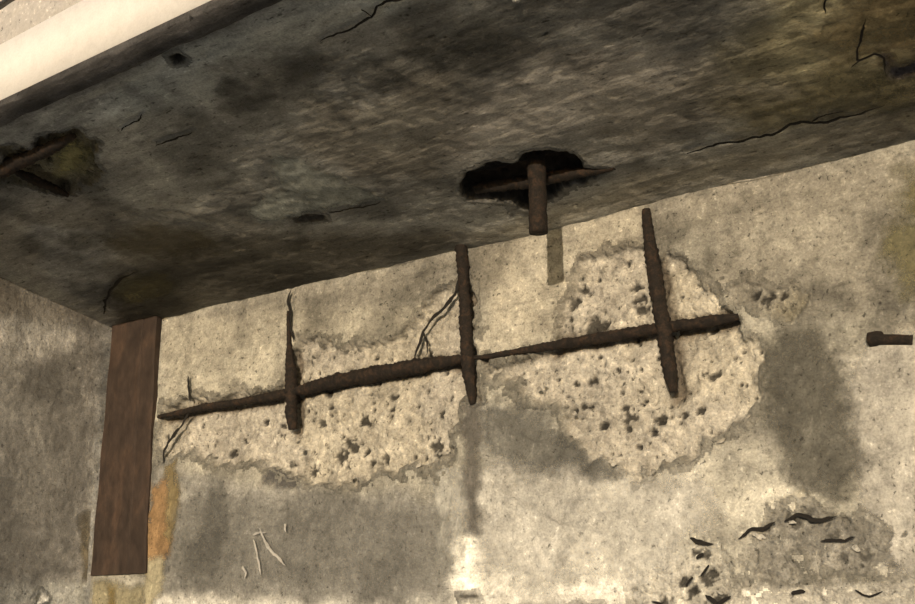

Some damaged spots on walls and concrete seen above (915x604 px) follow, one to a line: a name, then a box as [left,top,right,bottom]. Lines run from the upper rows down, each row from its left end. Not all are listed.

crack [320,0,401,42]
crack [851,19,886,74]
spalling [0,126,109,202]
spalling [453,147,616,217]
crack [687,105,885,154]
spalling [152,208,814,494]
damp [767,332,915,573]
corrosion [80,460,179,604]
peeling [623,496,915,604]